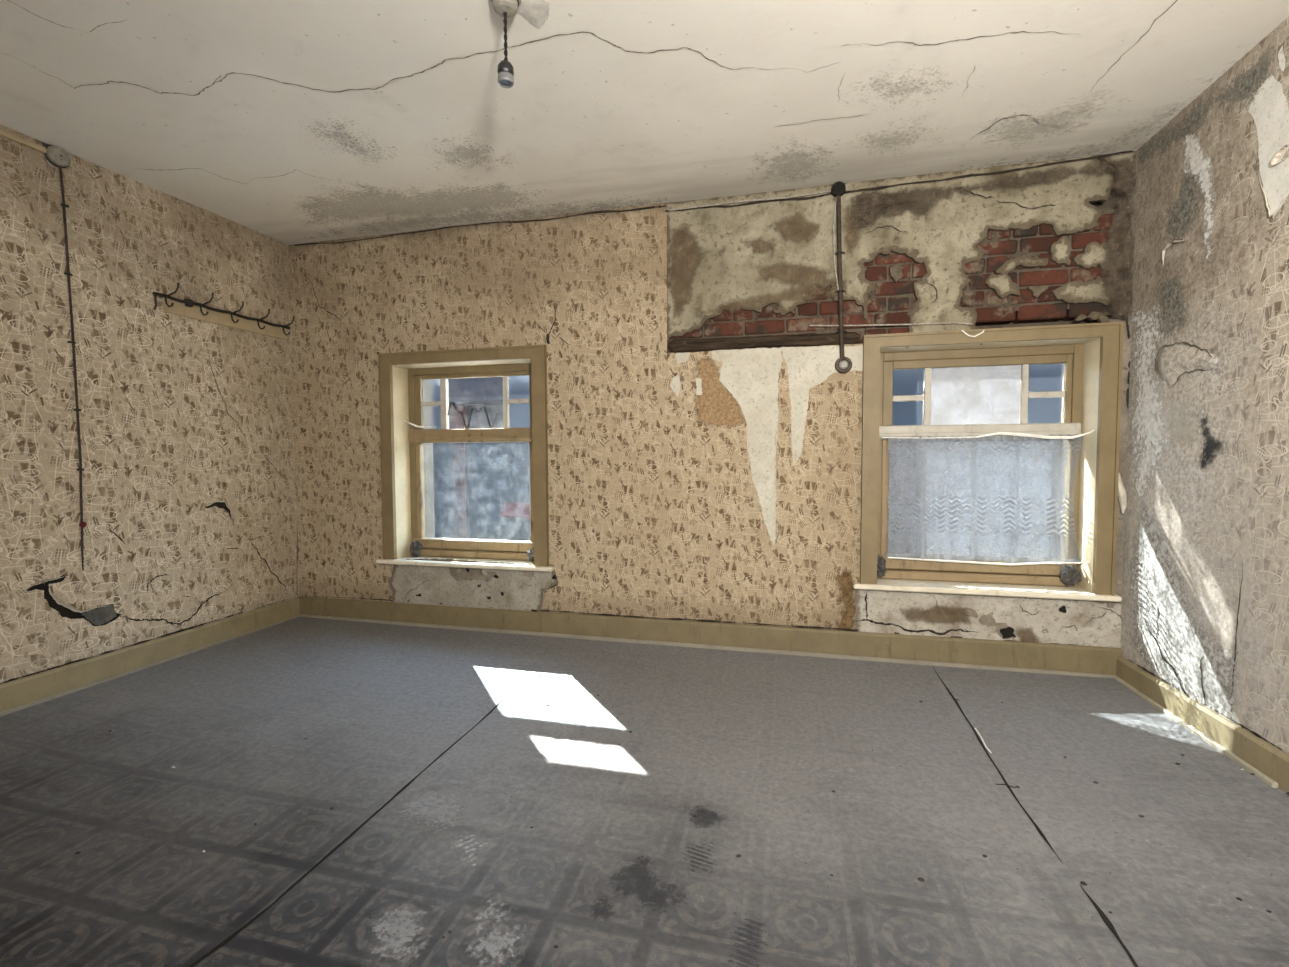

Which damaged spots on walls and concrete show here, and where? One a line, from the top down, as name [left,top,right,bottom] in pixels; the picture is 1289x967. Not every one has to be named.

crack [7,0,128,33]
crack [1089,0,1178,94]
crack [2,31,1080,128]
crack [970,114,1069,140]
flaking render [667,151,1136,648]
leakage [846,47,1273,720]
crack [119,574,226,625]
flaking render [389,558,558,612]
crack [856,592,978,635]